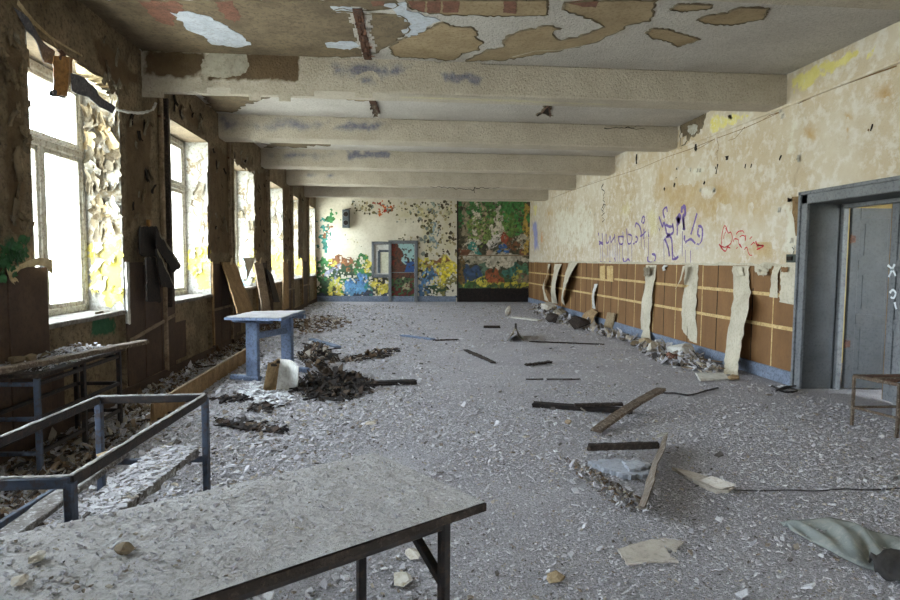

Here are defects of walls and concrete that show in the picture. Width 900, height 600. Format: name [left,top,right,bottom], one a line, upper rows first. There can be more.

rust [348,6,380,60]
spalling [79,0,701,62]
spalling [669,3,770,26]
peeling [201,53,249,78]
peeling [0,18,36,238]
peeling [73,18,157,295]
rust [369,100,380,118]
peeling [664,113,729,200]
peeling [350,198,459,259]